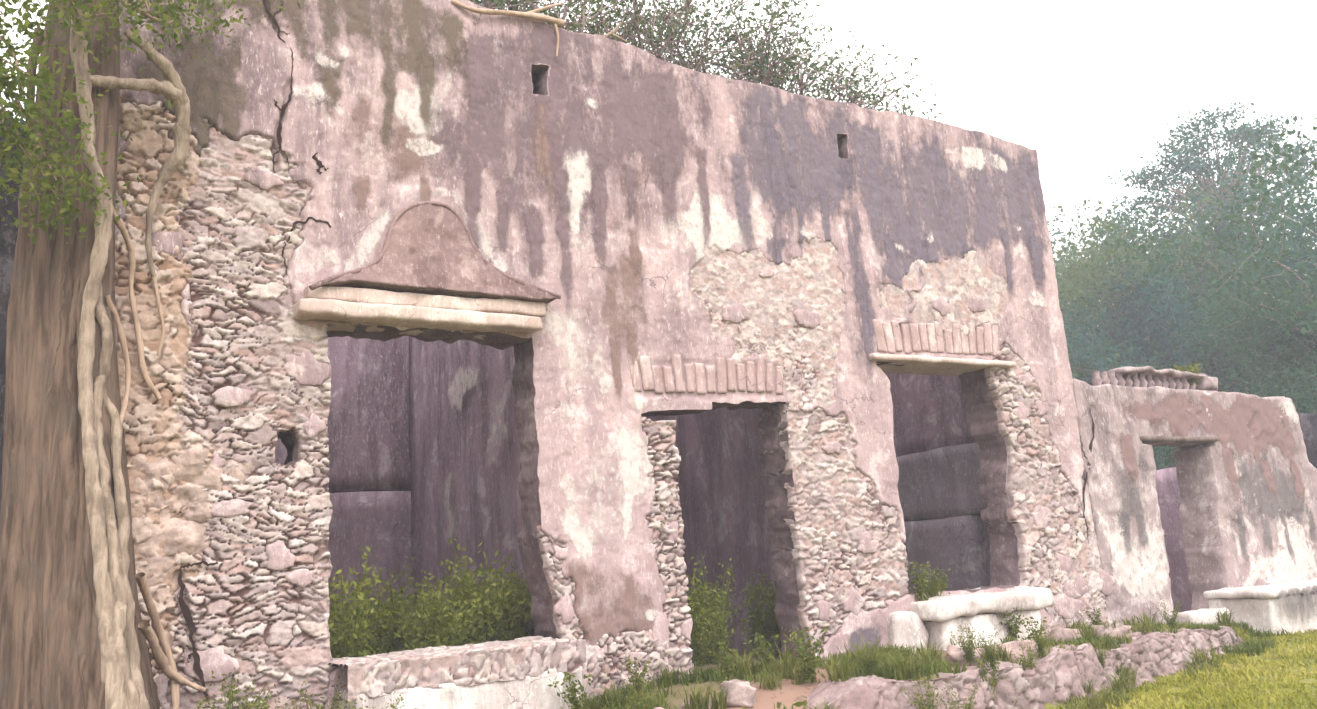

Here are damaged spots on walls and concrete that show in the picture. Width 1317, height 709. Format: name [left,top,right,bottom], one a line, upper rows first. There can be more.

spalling [115,96,353,709]
crack [263,0,329,174]
water stain [136,0,711,395]
spalling [660,193,909,661]
peeling [1029,291,1045,307]
spalling [983,344,1168,629]